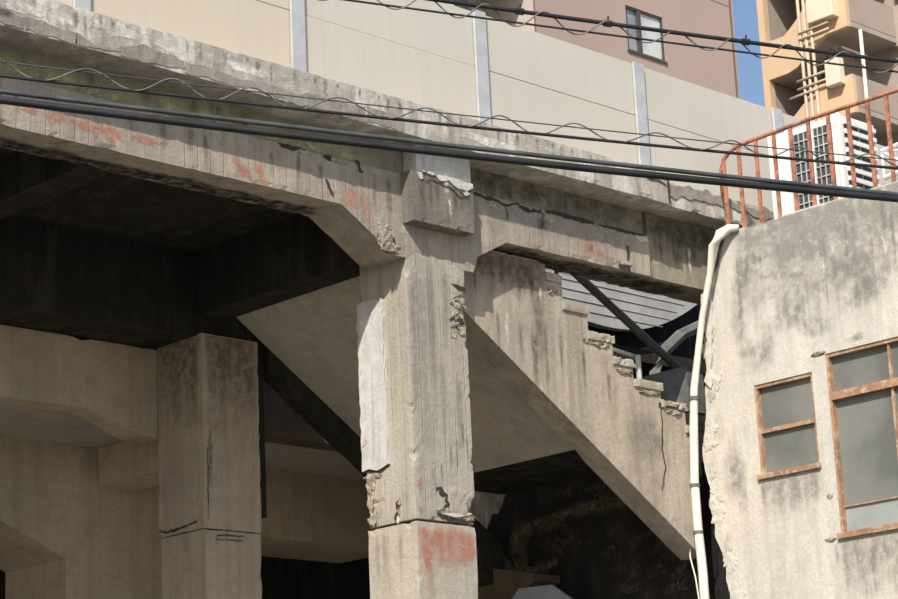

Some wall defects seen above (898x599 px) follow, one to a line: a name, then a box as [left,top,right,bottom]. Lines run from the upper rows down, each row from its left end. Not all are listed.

peeling [0,0,405,132]
peeling [463,131,520,150]
spalling [374,218,401,255]
crack [425,179,645,260]
water stain [740,182,898,291]
spalling [449,283,468,339]
peeling [701,291,722,403]
peeling [356,298,391,527]
crack [616,370,683,491]
spalling [703,416,719,452]
spalling [436,485,475,525]
spalling [709,463,746,599]